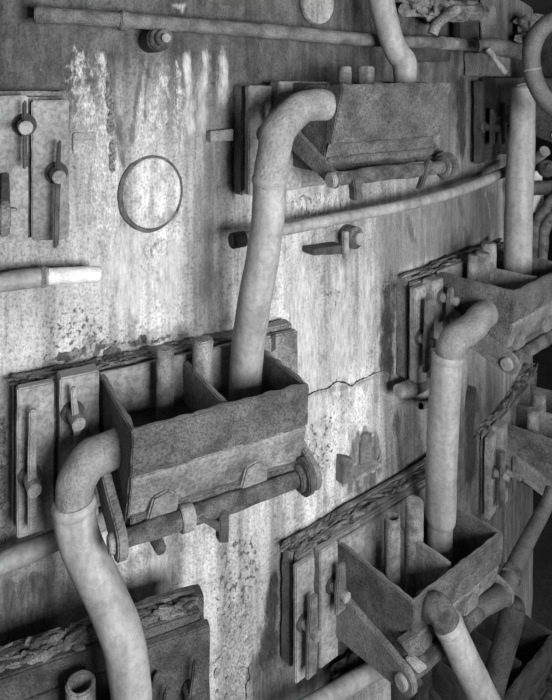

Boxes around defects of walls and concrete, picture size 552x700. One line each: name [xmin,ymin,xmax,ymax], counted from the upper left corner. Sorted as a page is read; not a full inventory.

efflorescence [133,52,207,161]
leakage [218,42,235,195]
spalling [45,334,179,363]
crack [308,370,383,396]